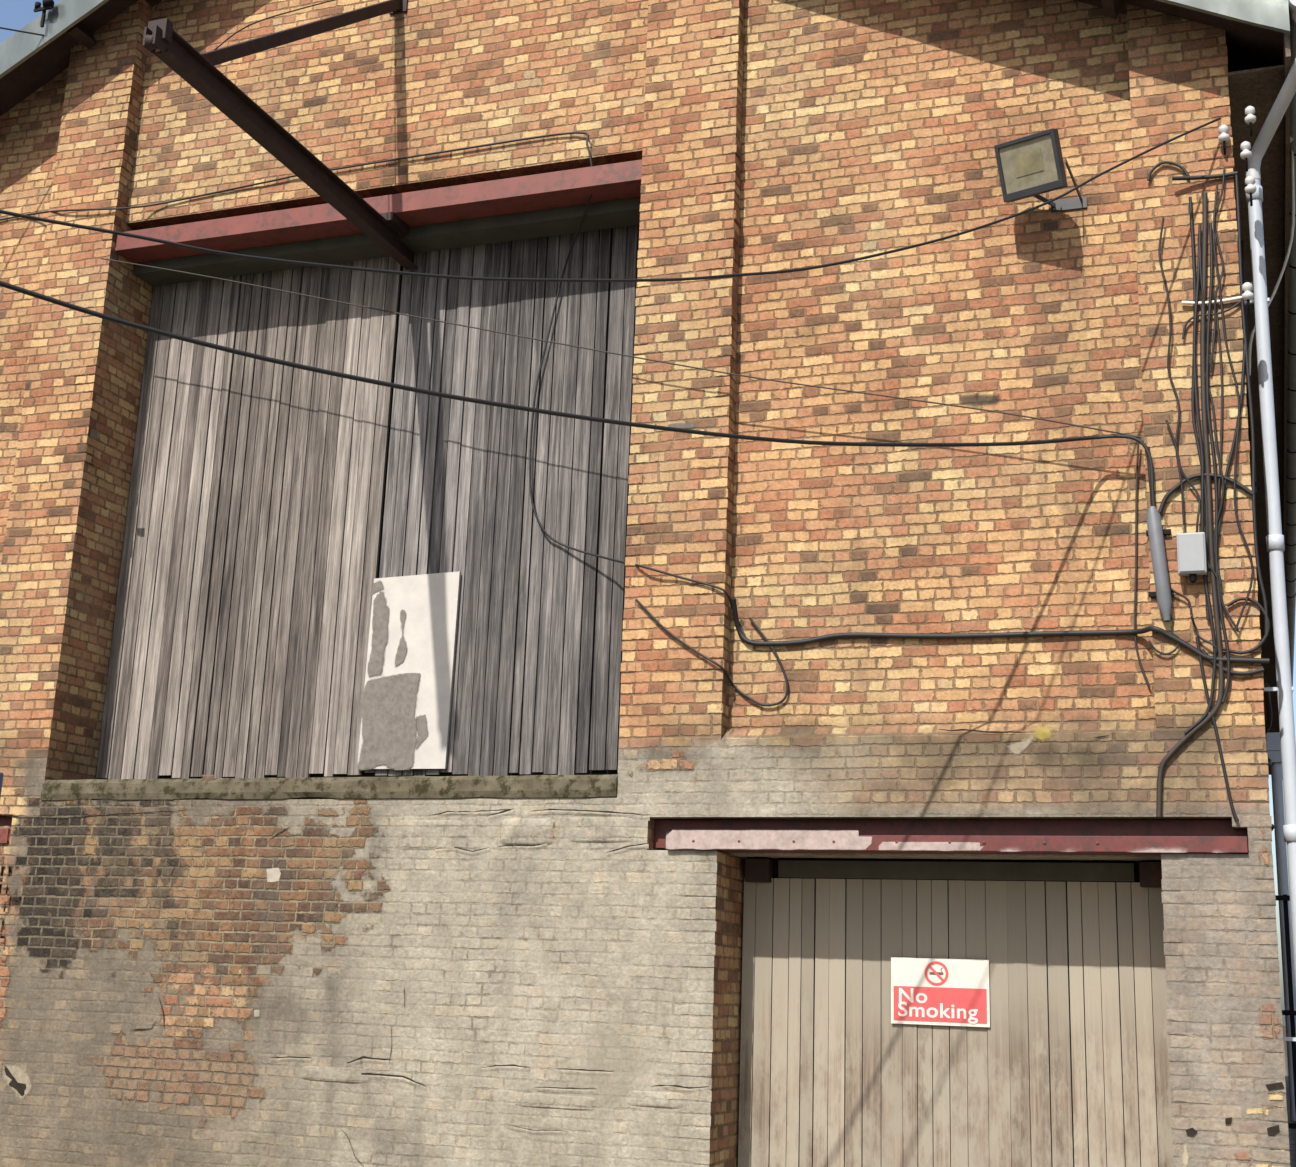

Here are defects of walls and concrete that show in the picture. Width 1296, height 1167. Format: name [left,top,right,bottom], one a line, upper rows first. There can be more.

peeling [0,788,390,1131]